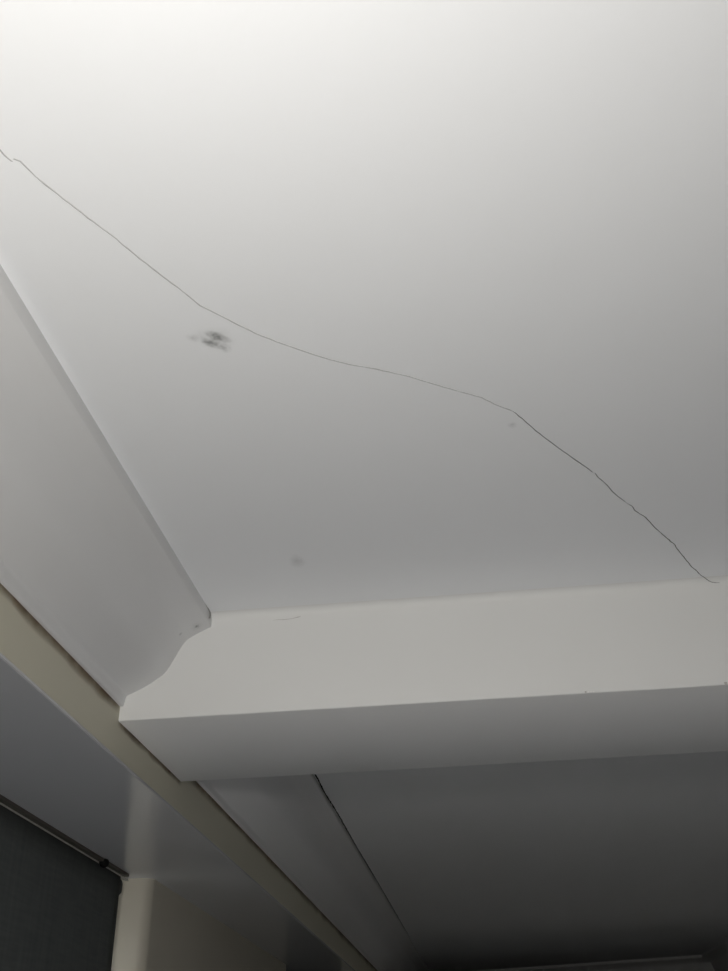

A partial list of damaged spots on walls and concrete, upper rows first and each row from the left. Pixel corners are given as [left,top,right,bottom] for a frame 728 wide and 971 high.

crack [0,150,716,583]